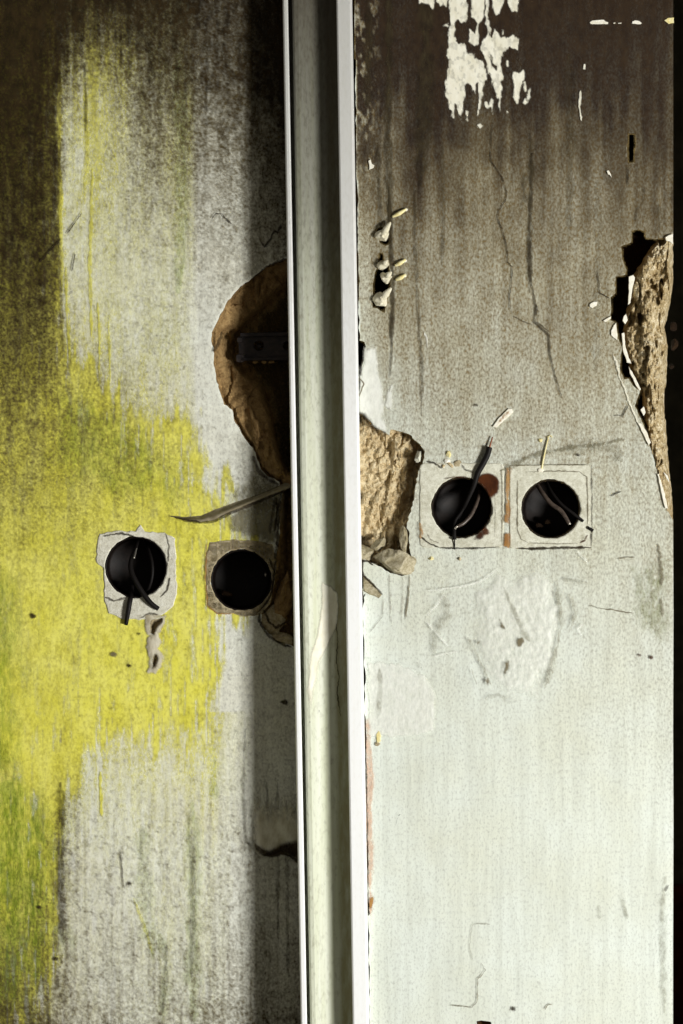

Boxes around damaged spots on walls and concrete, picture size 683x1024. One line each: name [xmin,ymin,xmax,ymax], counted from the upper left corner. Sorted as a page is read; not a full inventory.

peeling [419,0,530,128]
peeling [0,43,294,1024]
spalling [372,228,391,312]
damp [379,175,395,372]
flaking render [359,348,472,598]
corrosion [447,468,510,548]
crack [490,123,562,398]
flaking render [603,234,678,519]